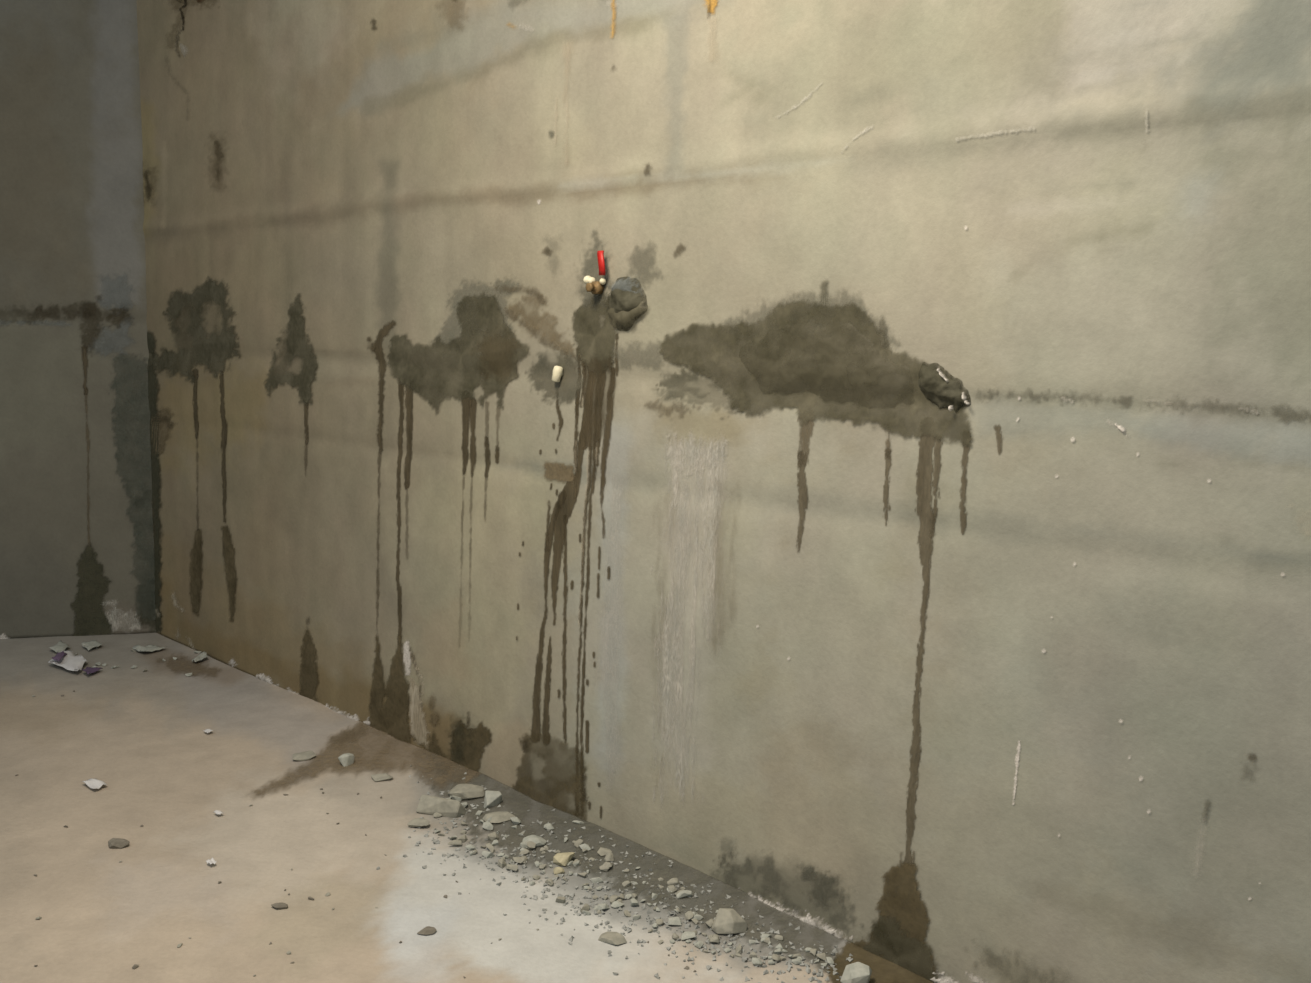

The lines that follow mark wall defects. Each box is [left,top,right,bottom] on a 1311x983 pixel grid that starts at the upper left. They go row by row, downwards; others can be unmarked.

water stain [71,279,240,636]
water stain [255,233,997,983]
water stain [994,425,1002,454]